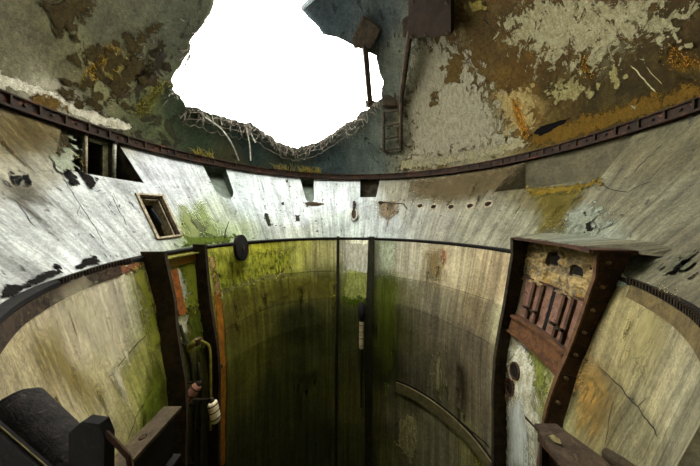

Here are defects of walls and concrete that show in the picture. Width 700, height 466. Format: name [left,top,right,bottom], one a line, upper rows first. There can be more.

spalling [0,0,387,161]
peeling [395,0,700,171]
corrosion [511,78,700,148]
peeling [50,135,99,190]
corrosion [379,201,398,226]
spalling [0,263,63,300]
spalling [74,255,101,269]
damp [232,261,335,332]
spalling [522,242,594,305]
peeling [616,250,698,287]
crack [597,366,657,443]